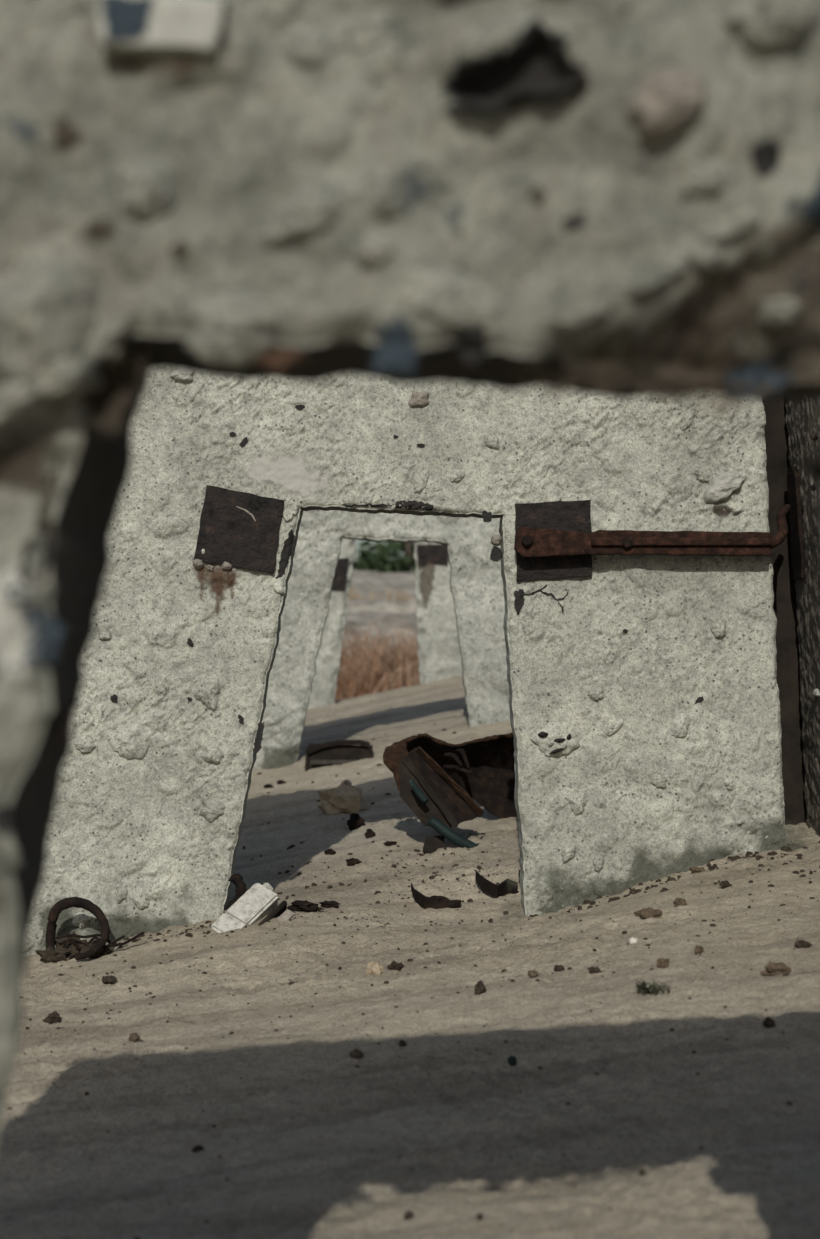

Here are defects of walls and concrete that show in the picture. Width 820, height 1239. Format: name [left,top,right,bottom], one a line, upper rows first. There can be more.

rust [199,564,236,612]
crack [524,584,569,613]